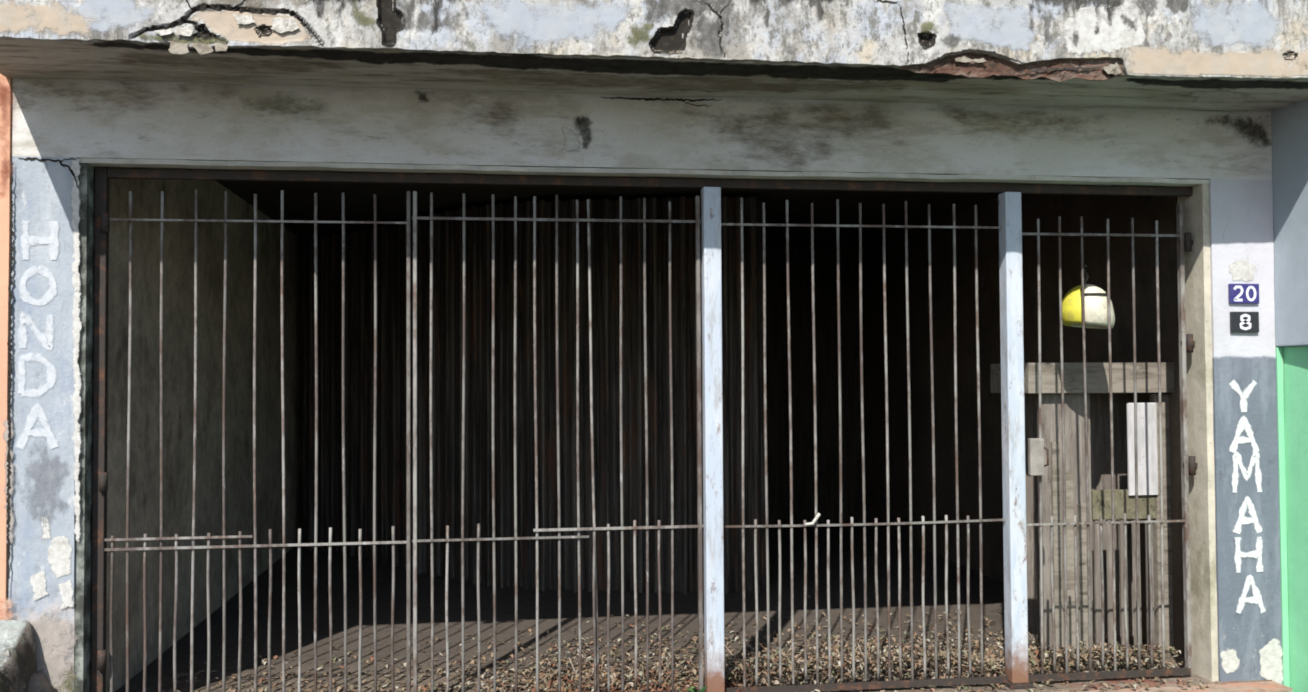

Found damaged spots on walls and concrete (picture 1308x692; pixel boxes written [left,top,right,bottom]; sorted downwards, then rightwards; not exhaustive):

peeling [0,0,310,55]
crack [132,0,323,46]
damp [92,0,1050,93]
hole [649,8,695,54]
spalling [900,0,1308,82]
damp [721,107,890,164]
mould [1207,116,1271,146]
peeling [29,159,82,692]
peeling [1220,649,1240,674]
peeling [1259,638,1283,684]